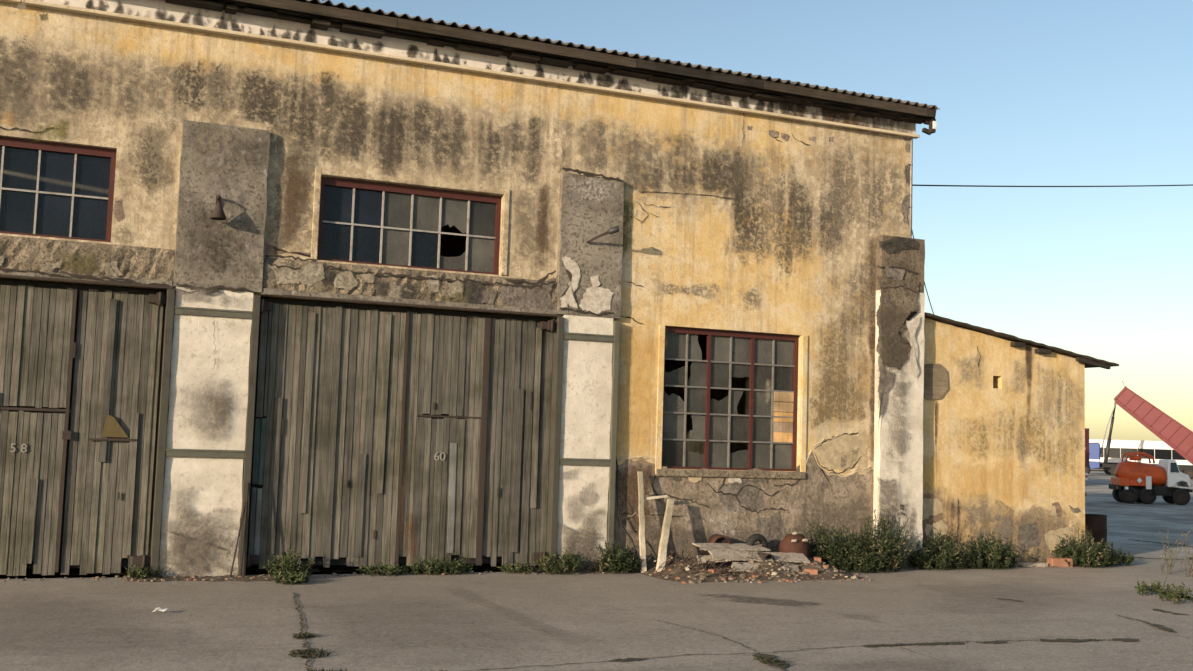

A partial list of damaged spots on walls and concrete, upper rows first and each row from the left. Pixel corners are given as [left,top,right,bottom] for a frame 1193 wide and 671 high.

leakage [407,45,465,65]
leakage [106,60,277,193]
leakage [269,72,466,247]
leakage [480,119,548,262]
flaking render [425,275,464,300]
peeling [477,257,613,314]
flaking render [613,137,921,563]
leakage [811,244,876,459]
crack [620,475,800,521]
crack [1129,539,1193,560]
crack [289,592,321,671]
crack [468,586,1193,671]